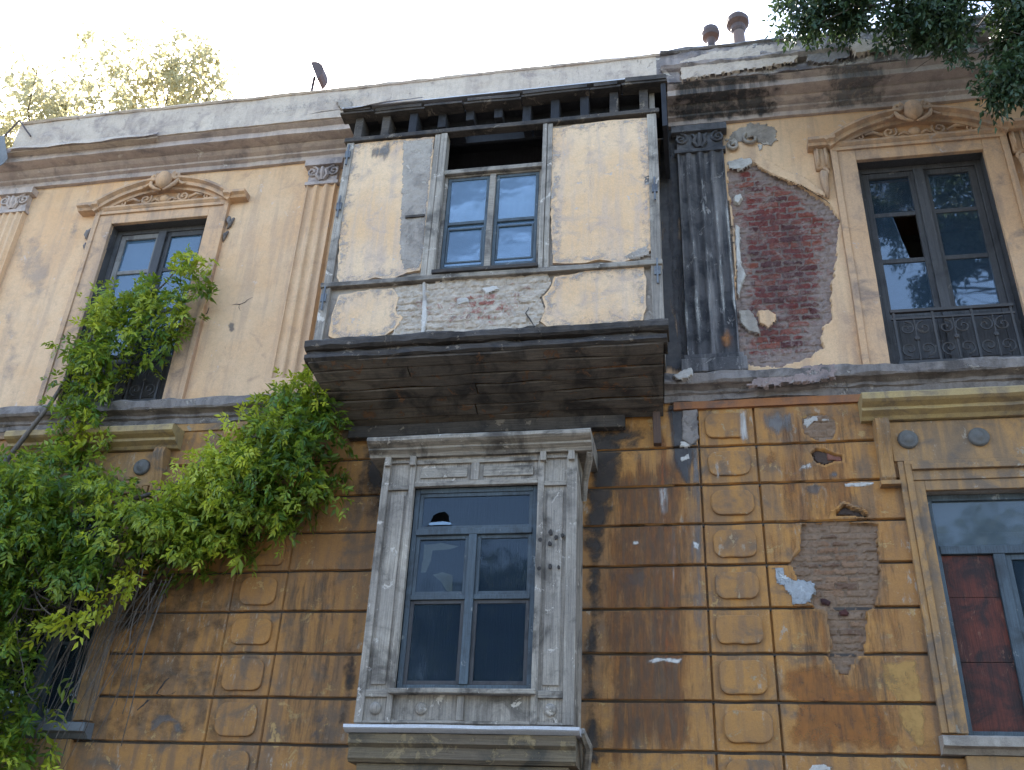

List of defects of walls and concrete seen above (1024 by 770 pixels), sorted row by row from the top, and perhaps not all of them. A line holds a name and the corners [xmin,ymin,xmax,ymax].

damp [669,74,777,121]
flaking render [680,42,850,84]
damp [825,64,885,107]
flaking render [359,139,651,336]
flaking render [725,122,840,368]
flaking render [680,409,700,461]
flaking render [802,414,842,466]
damp [584,436,621,699]
flaking render [772,501,880,675]
damp [586,714,600,763]